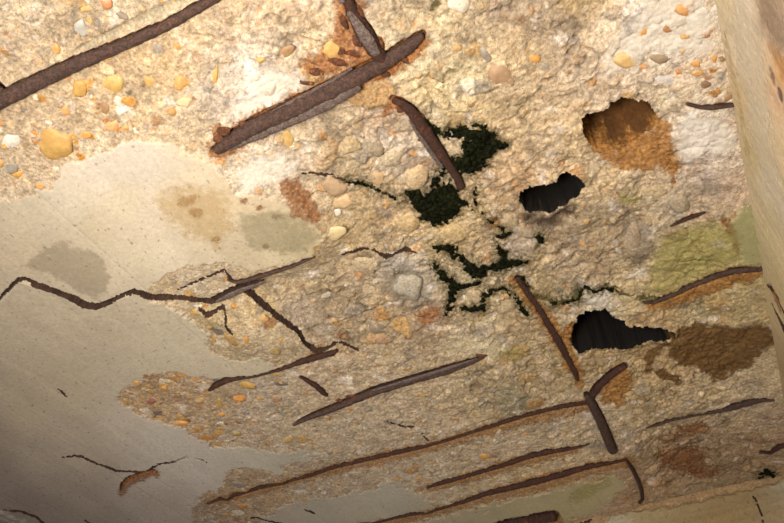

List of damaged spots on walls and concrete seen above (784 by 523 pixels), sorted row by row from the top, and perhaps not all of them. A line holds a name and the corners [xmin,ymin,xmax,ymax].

spalling [0,0,201,88]
corrosion [208,0,431,160]
spalling [488,64,514,86]
spalling [405,164,429,191]
spalling [440,221,469,245]
crack [0,269,359,353]
corrosion [509,275,585,389]
damp [585,291,611,308]
crack [767,284,784,332]
corrosion [601,369,634,407]
crack [62,454,207,490]
corrosion [364,446,635,523]